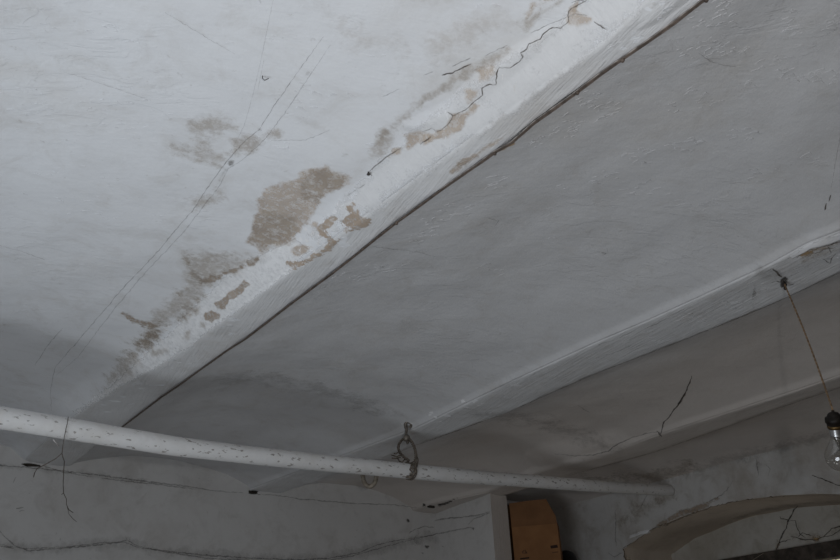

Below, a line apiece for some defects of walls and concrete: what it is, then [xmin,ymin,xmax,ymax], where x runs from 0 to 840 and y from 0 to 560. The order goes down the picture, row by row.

crack [370,0,585,175]
leakage [204,281,248,321]
leakage [201,258,259,282]
leakage [250,169,344,246]
flaking render [286,202,371,270]
flaking render [790,233,840,259]
crack [623,495,840,560]